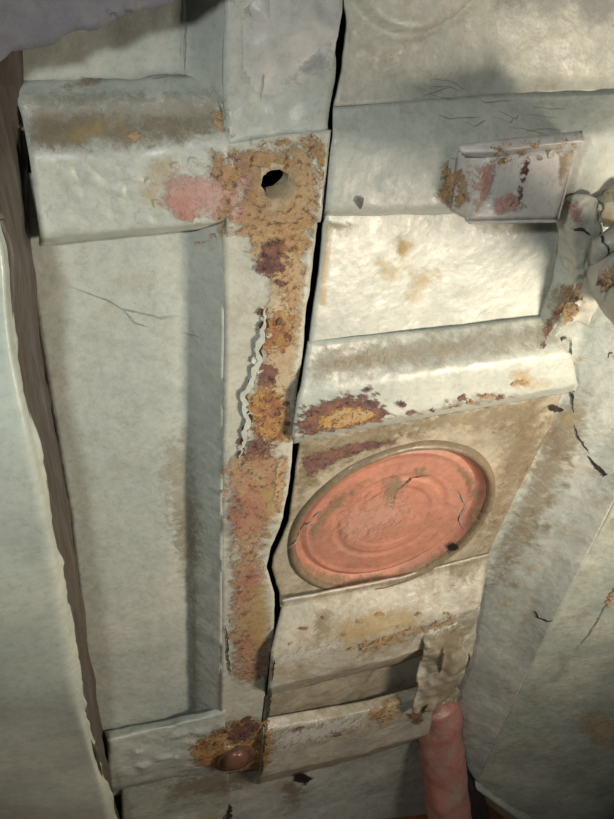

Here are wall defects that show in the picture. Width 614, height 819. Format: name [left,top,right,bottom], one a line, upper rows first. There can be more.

crack [415,79,562,134]
rust [435,158,475,209]
rust [228,133,328,348]
rust [595,261,614,293]
rust [540,271,588,349]
rust [294,385,511,438]
crack [548,391,608,477]
rust [186,695,424,773]
crack [223,805,233,819]